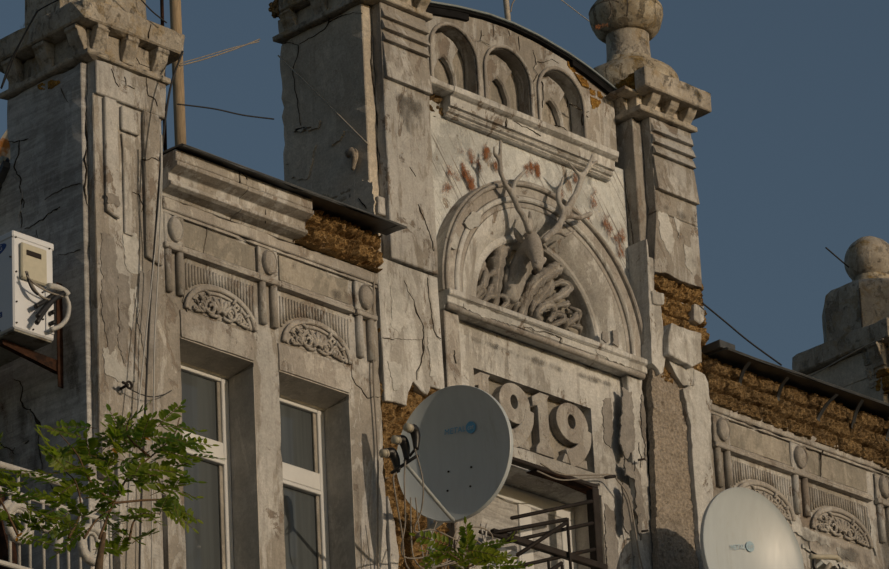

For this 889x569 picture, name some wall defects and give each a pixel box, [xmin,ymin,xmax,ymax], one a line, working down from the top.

crack [281,5,379,175]
crack [8,88,89,237]
corrosion [444,146,503,191]
corrosion [524,161,541,177]
corrosion [603,219,625,257]
peeling [657,211,693,274]
crack [384,277,457,381]
peeling [427,337,439,377]
peeling [463,303,513,326]
crack [0,378,54,492]
spalling [380,361,450,569]
spalling [602,274,710,569]